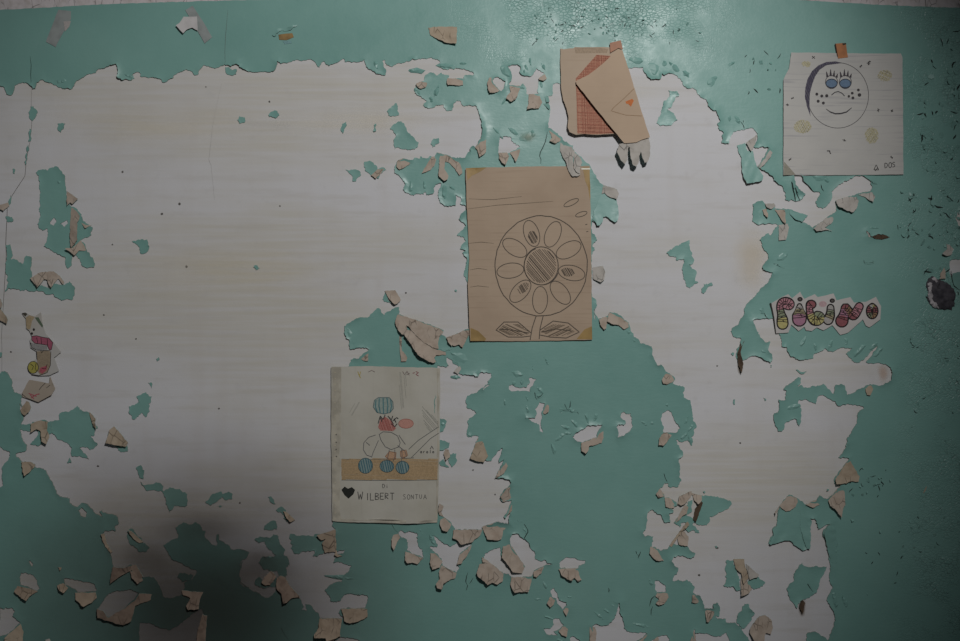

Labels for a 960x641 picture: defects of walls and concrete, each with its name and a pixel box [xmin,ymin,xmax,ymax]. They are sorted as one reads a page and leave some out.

peeling [0,58,669,641]
peeling [487,57,892,641]
spalling [926,244,960,311]